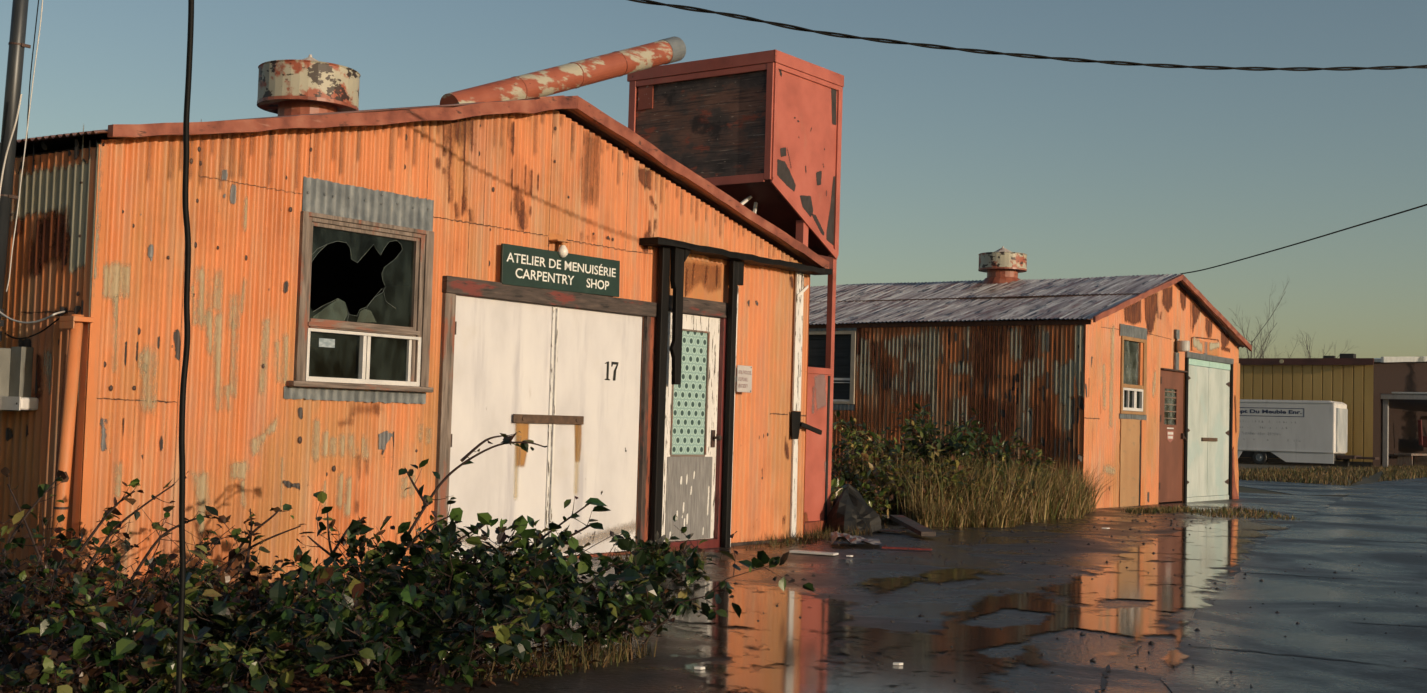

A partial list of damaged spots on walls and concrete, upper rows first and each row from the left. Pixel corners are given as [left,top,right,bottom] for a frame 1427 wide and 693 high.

corrosion [16,209,70,276]
peeling [11,125,248,410]
corrosion [511,122,539,230]
corrosion [625,147,657,252]
peeling [260,319,289,392]
corrosion [856,328,871,366]
peeling [100,419,124,451]
peeling [192,473,208,533]
peeling [230,418,277,506]
peeling [324,473,352,515]
peeling [298,407,415,497]
peeling [856,325,1114,481]